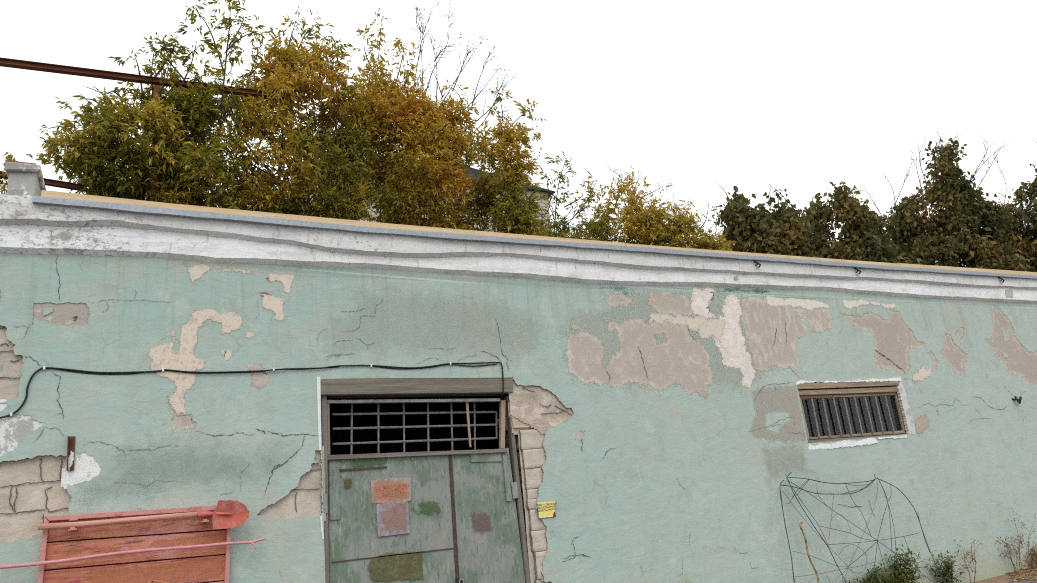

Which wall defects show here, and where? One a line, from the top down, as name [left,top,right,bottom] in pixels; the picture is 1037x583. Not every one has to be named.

peeling [33,302,90,326]
peeling [148,307,255,440]
peeling [261,273,294,321]
crack [318,298,384,360]
peeling [565,287,967,441]
peeling [986,306,1037,386]
spalling [0,325,101,544]
crack [207,429,319,495]
spalling [257,446,326,521]
spalling [497,381,573,583]